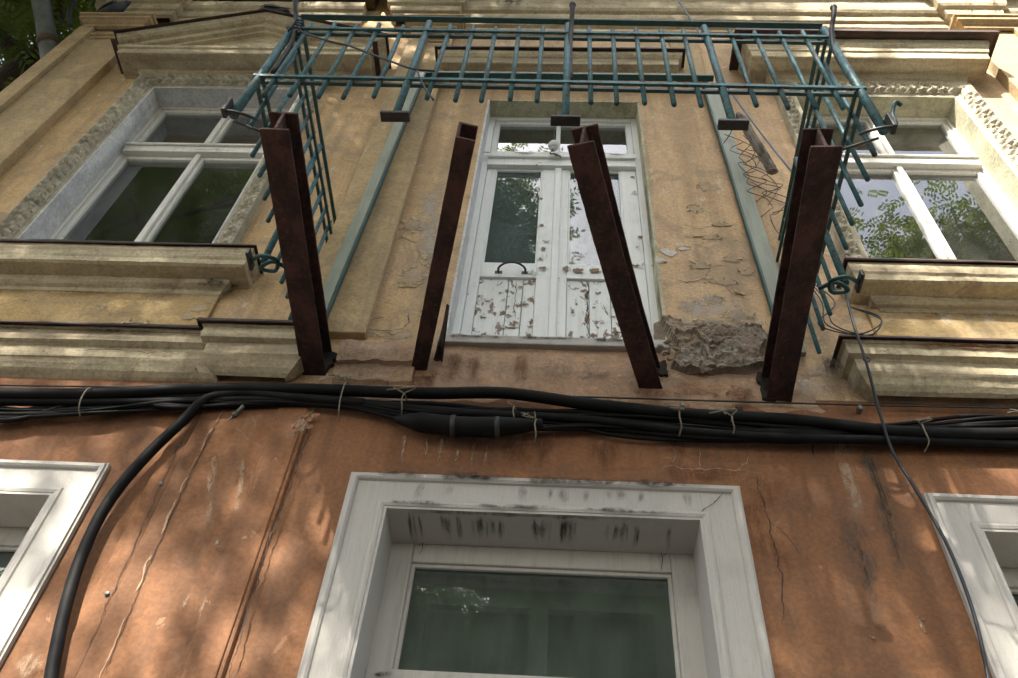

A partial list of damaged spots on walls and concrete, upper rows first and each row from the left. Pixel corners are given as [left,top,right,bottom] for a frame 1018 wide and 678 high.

peeling [518,239,549,289]
peeling [476,281,533,336]
peeling [568,286,621,338]
spalling [653,221,777,402]
crack [229,430,312,678]
damp [480,504,539,529]
crack [663,445,798,622]